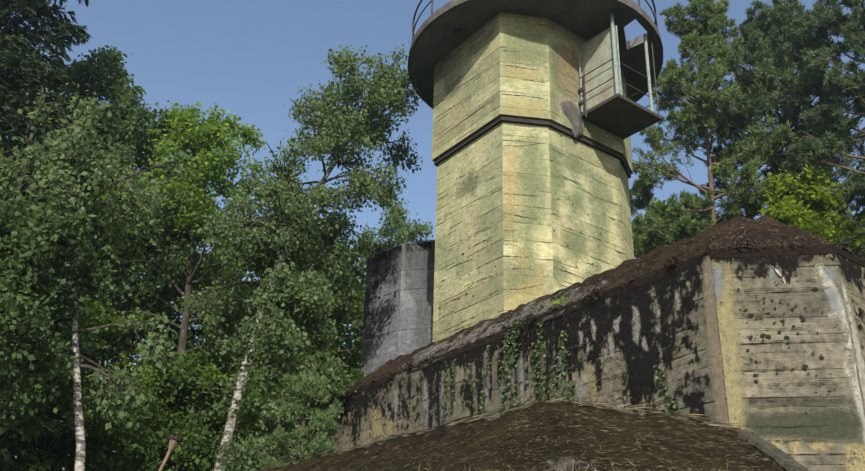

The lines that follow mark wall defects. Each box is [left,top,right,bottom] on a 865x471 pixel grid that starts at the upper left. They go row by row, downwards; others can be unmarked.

leakage [335,242,865,446]